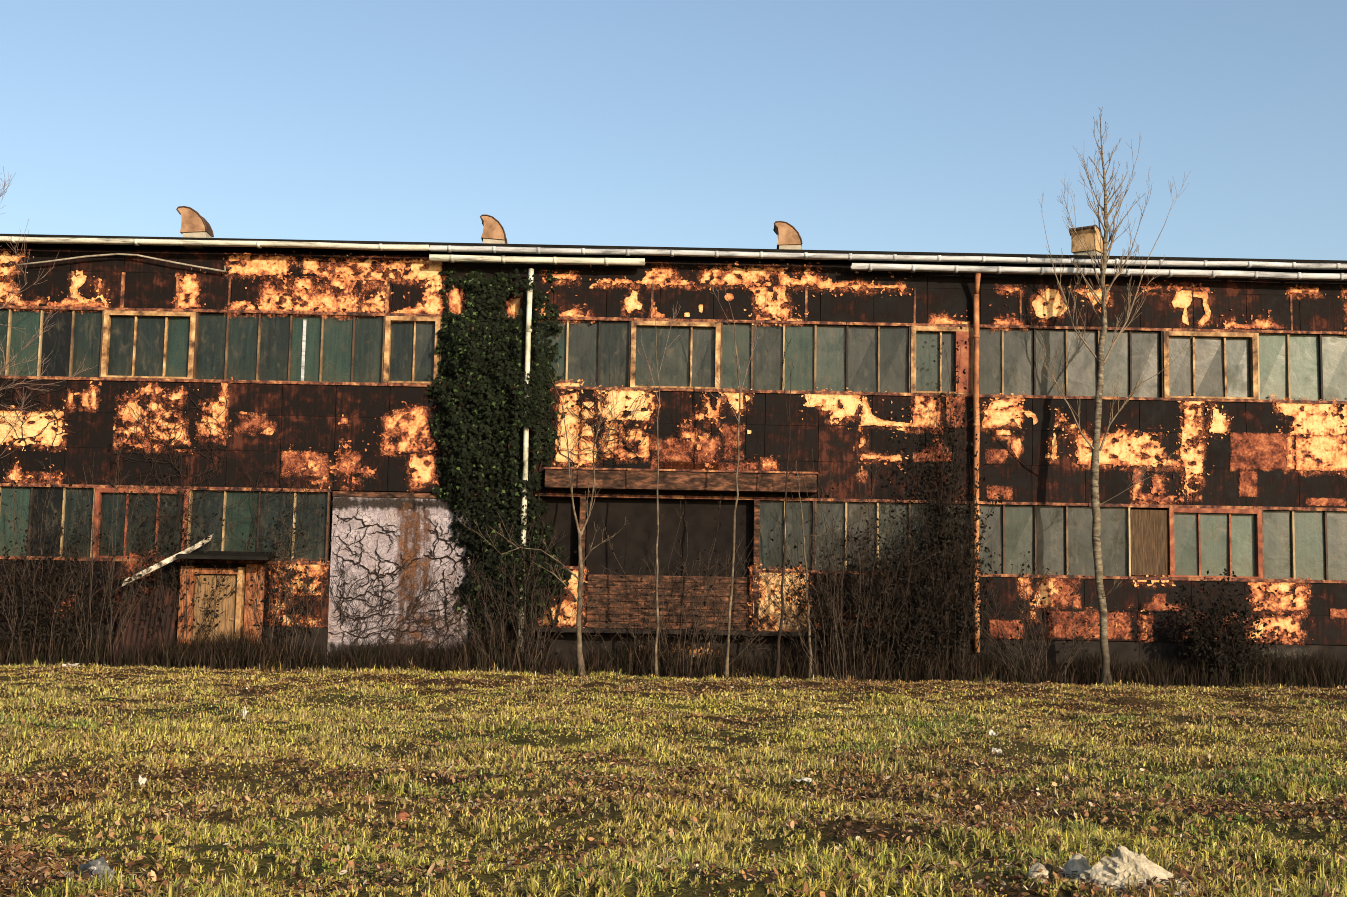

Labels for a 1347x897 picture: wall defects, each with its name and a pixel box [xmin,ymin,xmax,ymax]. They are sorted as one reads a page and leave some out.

peeling [222,250,467,322]
peeling [506,261,913,326]
peeling [0,377,247,484]
rust [650,424,779,471]
peeling [801,387,945,483]
rust [913,397,965,462]
rust [987,486,1012,500]
peeling [982,391,1234,505]
rust [1230,432,1291,497]
peeling [1270,394,1347,477]
crack [329,507,467,645]
rust [1048,578,1203,641]